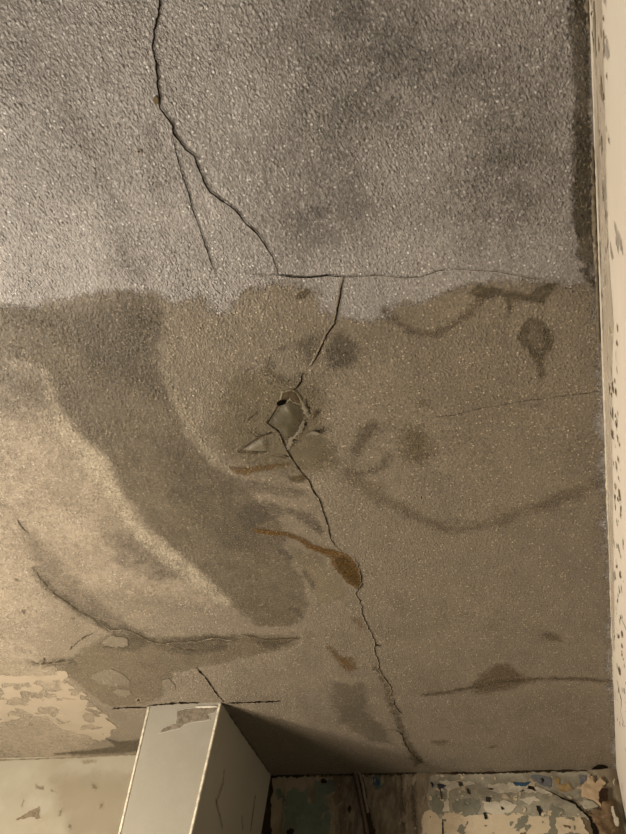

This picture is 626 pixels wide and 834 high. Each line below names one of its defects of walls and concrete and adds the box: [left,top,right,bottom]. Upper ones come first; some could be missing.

crack [150,0,553,390]
leakage [567,0,595,270]
spalling [590,0,610,102]
peeling [602,178,623,261]
peeling [0,383,218,758]
crack [33,570,296,772]
rust [254,529,361,588]
leakage [0,268,616,776]
crack [267,406,425,765]
spalling [608,378,622,527]
peeling [611,536,624,676]
peeling [421,765,621,834]